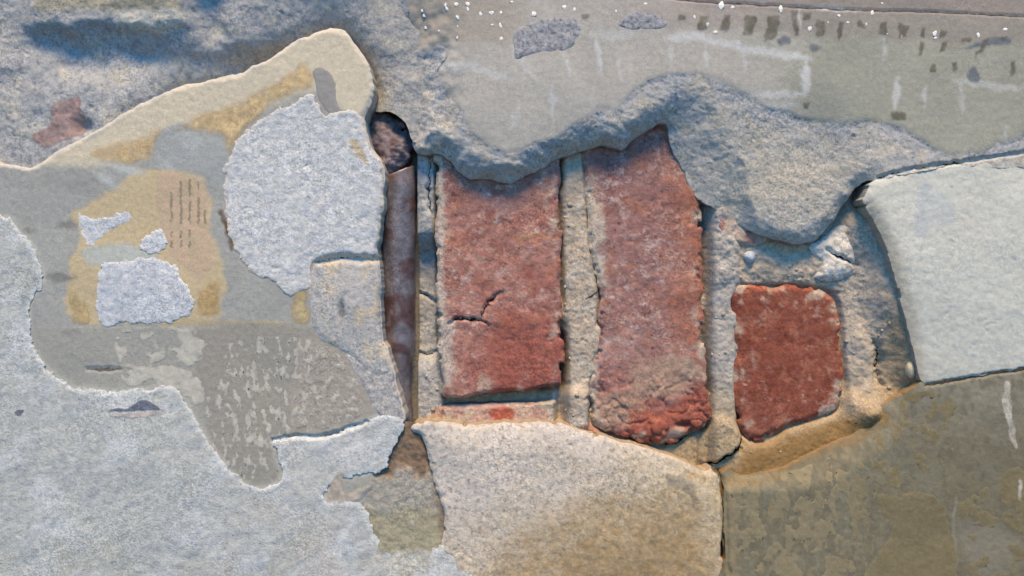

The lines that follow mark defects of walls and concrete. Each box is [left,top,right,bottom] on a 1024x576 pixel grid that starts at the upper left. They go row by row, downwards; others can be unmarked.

peeling [222,67,384,296]
spalling [95,228,445,576]
crack [453,296,496,323]
spalling [620,405,703,444]